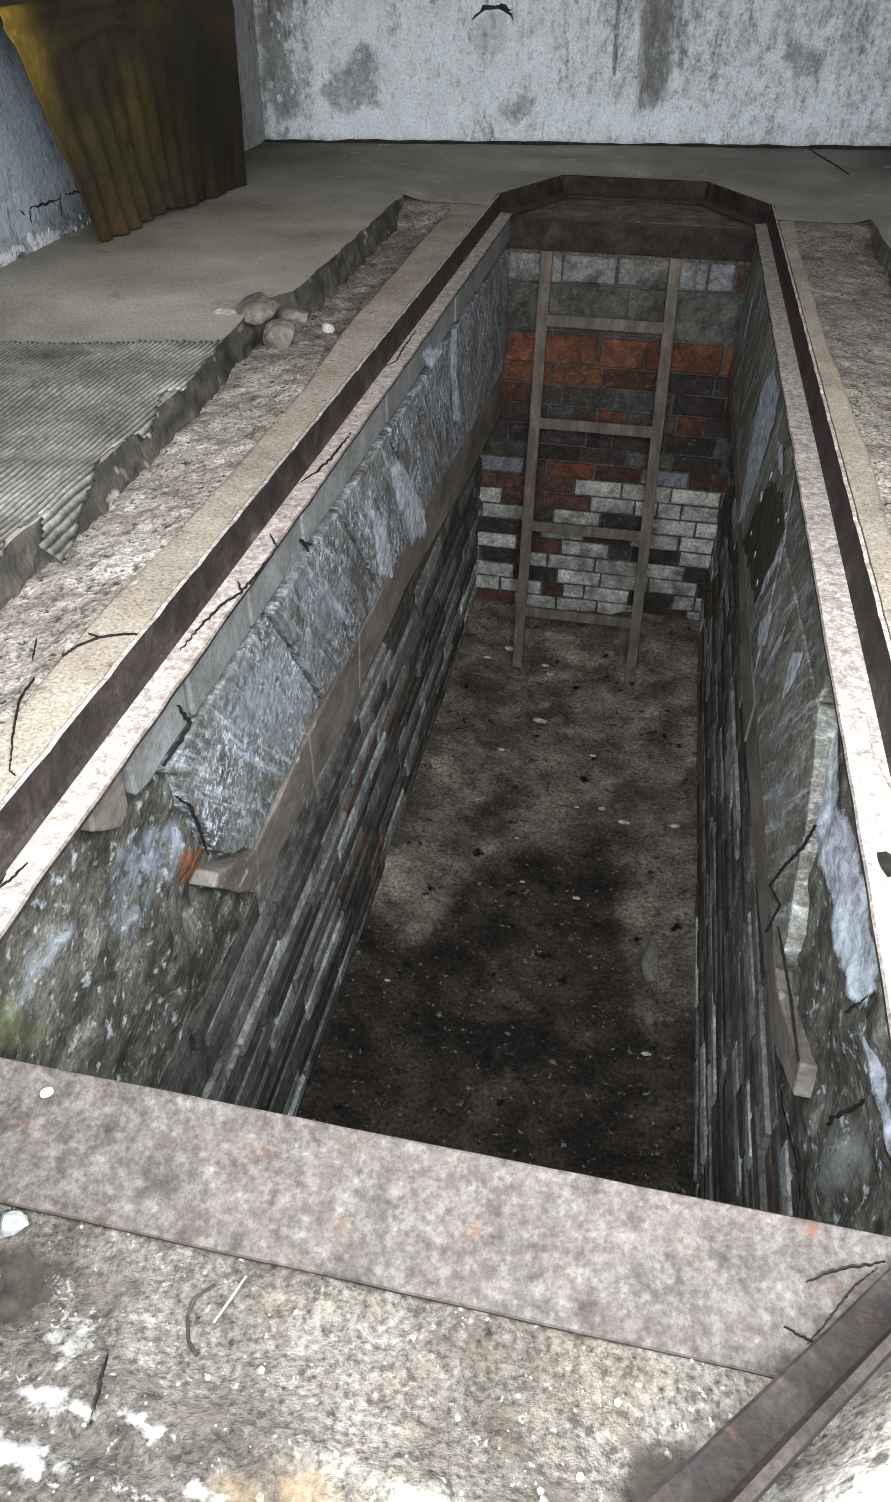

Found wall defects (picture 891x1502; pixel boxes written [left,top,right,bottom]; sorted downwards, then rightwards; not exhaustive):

crack [472,3,513,20]
leakage [639,0,674,109]
crack [180,533,313,651]
crack [9,633,140,776]
spalling [0,252,891,1236]
crack [765,825,817,1061]